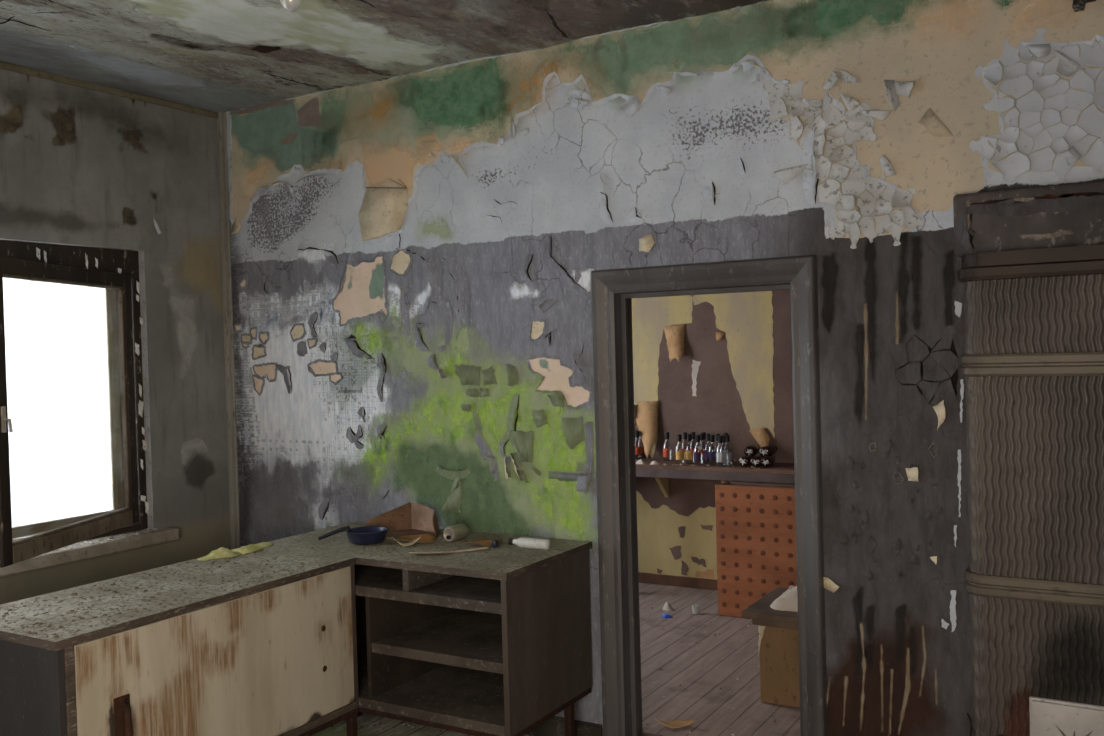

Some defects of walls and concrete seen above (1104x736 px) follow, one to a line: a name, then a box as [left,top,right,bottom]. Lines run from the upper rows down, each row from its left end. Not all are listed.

crack [0,0,101,32]
flaking render [50,108,76,146]
peeling [227,0,1104,326]
peeling [234,323,290,396]
peeling [290,323,343,386]
leakage [131,0,922,547]
peeling [529,299,556,342]
leakage [943,251,955,325]
peeling [437,354,594,494]
peeling [894,456,919,481]
flaking render [941,590,957,632]
rust [827,588,939,736]